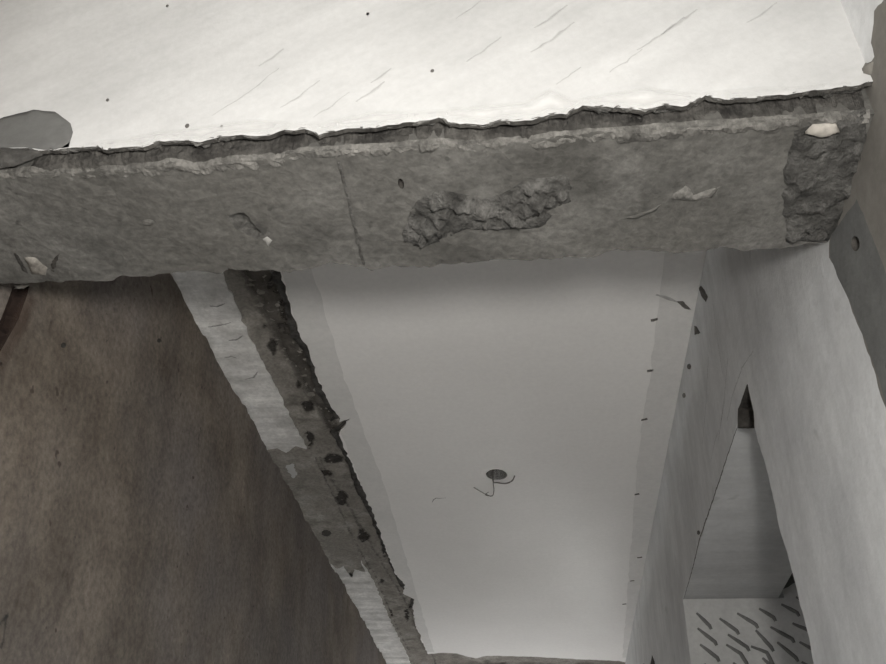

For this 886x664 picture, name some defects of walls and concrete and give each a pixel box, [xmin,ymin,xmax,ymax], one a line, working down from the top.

flaking render [0,81,870,181]
spalling [228,212,272,246]
spalling [402,175,572,248]
spalling [14,253,60,289]
peeling [223,269,625,664]